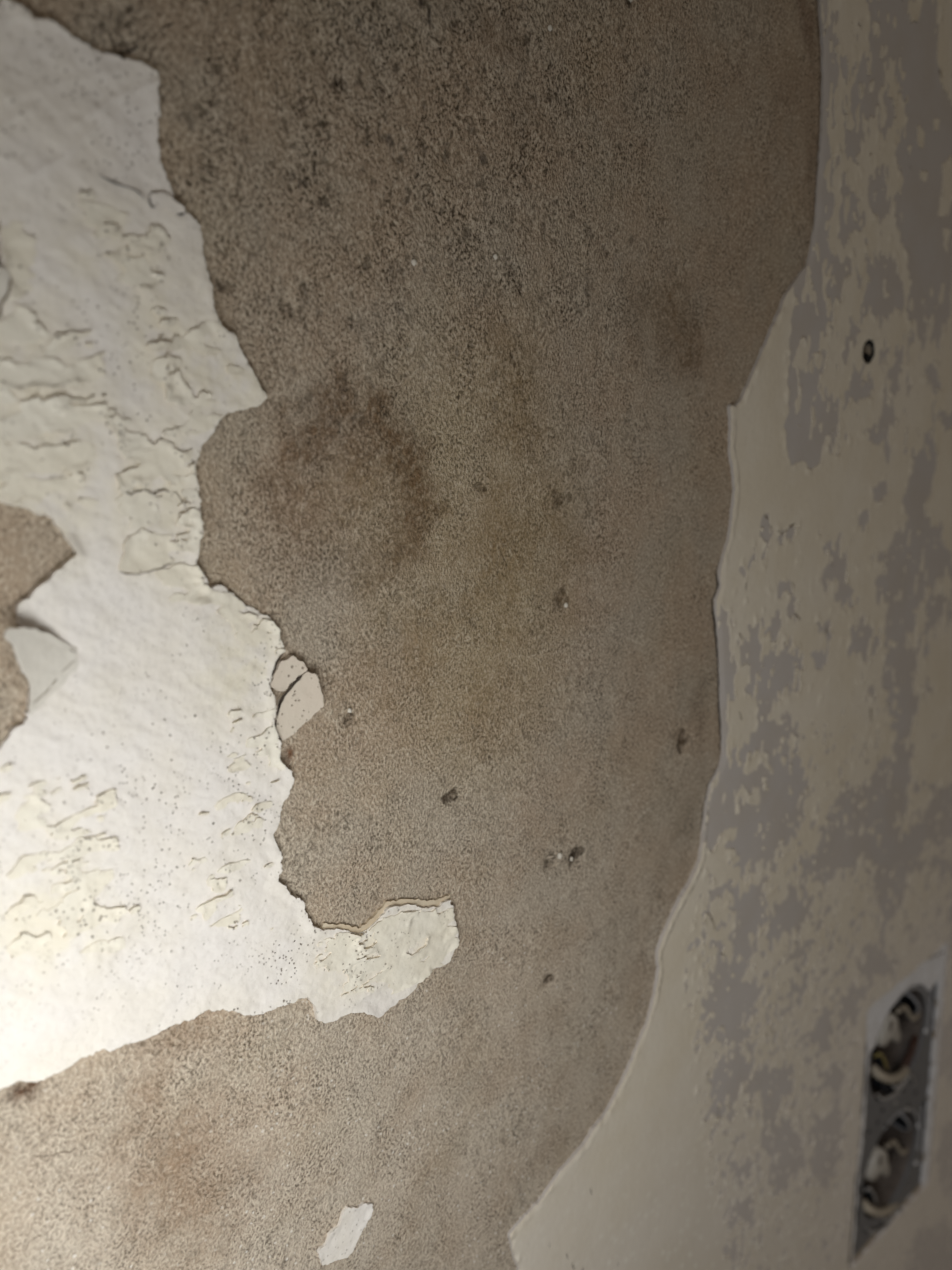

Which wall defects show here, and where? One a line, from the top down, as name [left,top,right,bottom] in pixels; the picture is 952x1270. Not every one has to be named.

peeling [0,0,460,1090]
peeling [507,0,952,1270]
peeling [316,1202,373,1265]